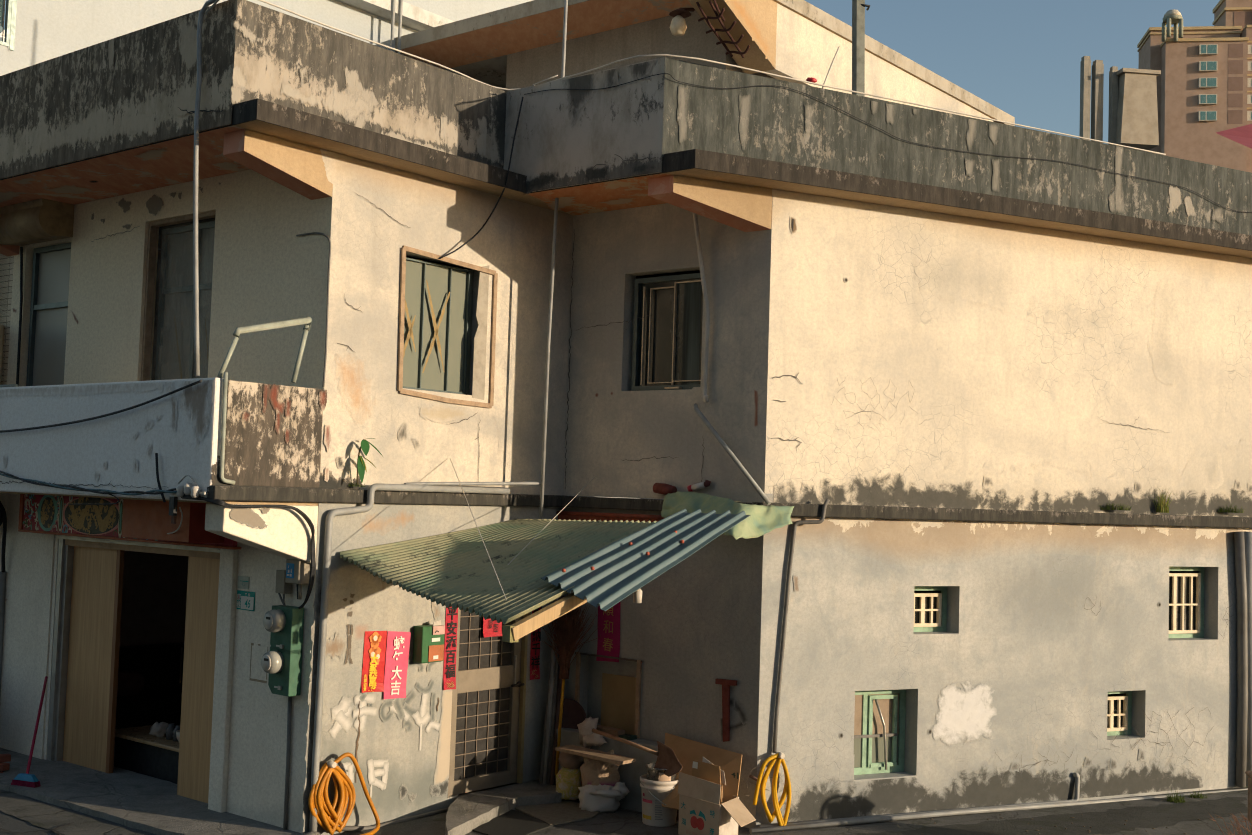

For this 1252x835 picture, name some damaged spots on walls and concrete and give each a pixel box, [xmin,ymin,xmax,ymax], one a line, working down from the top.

leakage [562,60,655,128]
leakage [677,85,690,144]
leakage [738,94,752,150]
leakage [804,104,814,133]
leakage [871,101,896,125]
peeling [146,191,182,216]
leakage [585,166,608,183]
leakage [965,119,1000,192]
leakage [1109,146,1125,213]
leakage [688,314,1252,638]
leakage [756,733,1248,828]